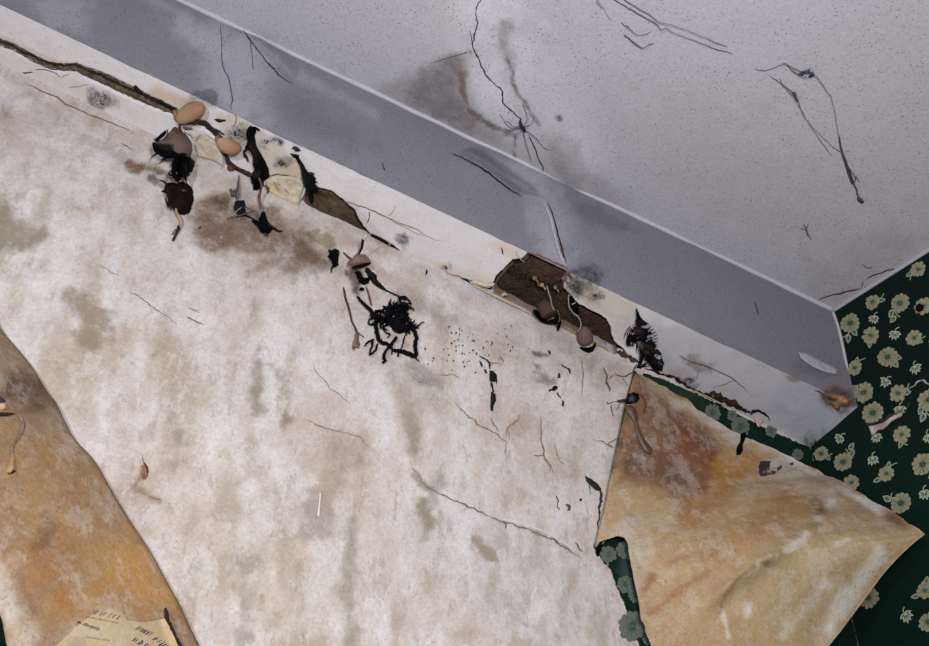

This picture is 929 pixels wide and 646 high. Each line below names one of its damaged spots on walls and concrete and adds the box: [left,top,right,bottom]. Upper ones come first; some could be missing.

mould [89,92,111,108]
crack [0,26,252,178]
crack [244,31,293,84]
leakage [418,72,511,134]
crack [434,0,544,172]
peeling [184,130,225,167]
leakage [196,193,334,270]
flaking render [265,174,400,251]
peeling [0,328,199,646]
crack [410,462,583,557]
crack [456,403,566,472]
peeling [470,253,925,646]